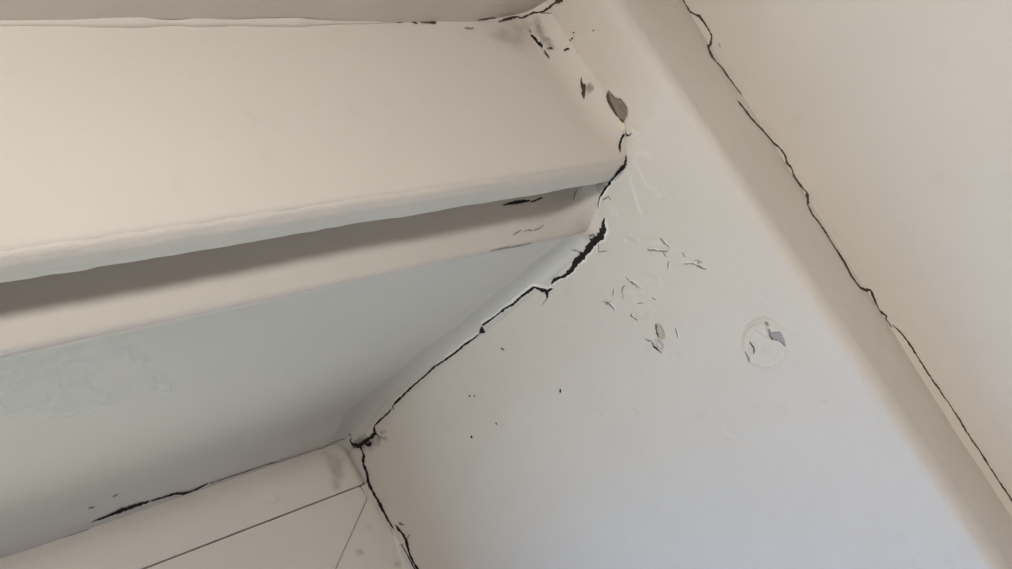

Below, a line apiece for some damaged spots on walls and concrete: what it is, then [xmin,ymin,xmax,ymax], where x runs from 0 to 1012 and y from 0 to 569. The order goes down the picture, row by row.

crack [465,0,563,30]
spalling [606,91,642,140]
crack [647,238,707,270]
crack [683,0,1012,501]
crack [63,131,631,569]
crack [602,276,680,353]
spalling [655,324,665,350]